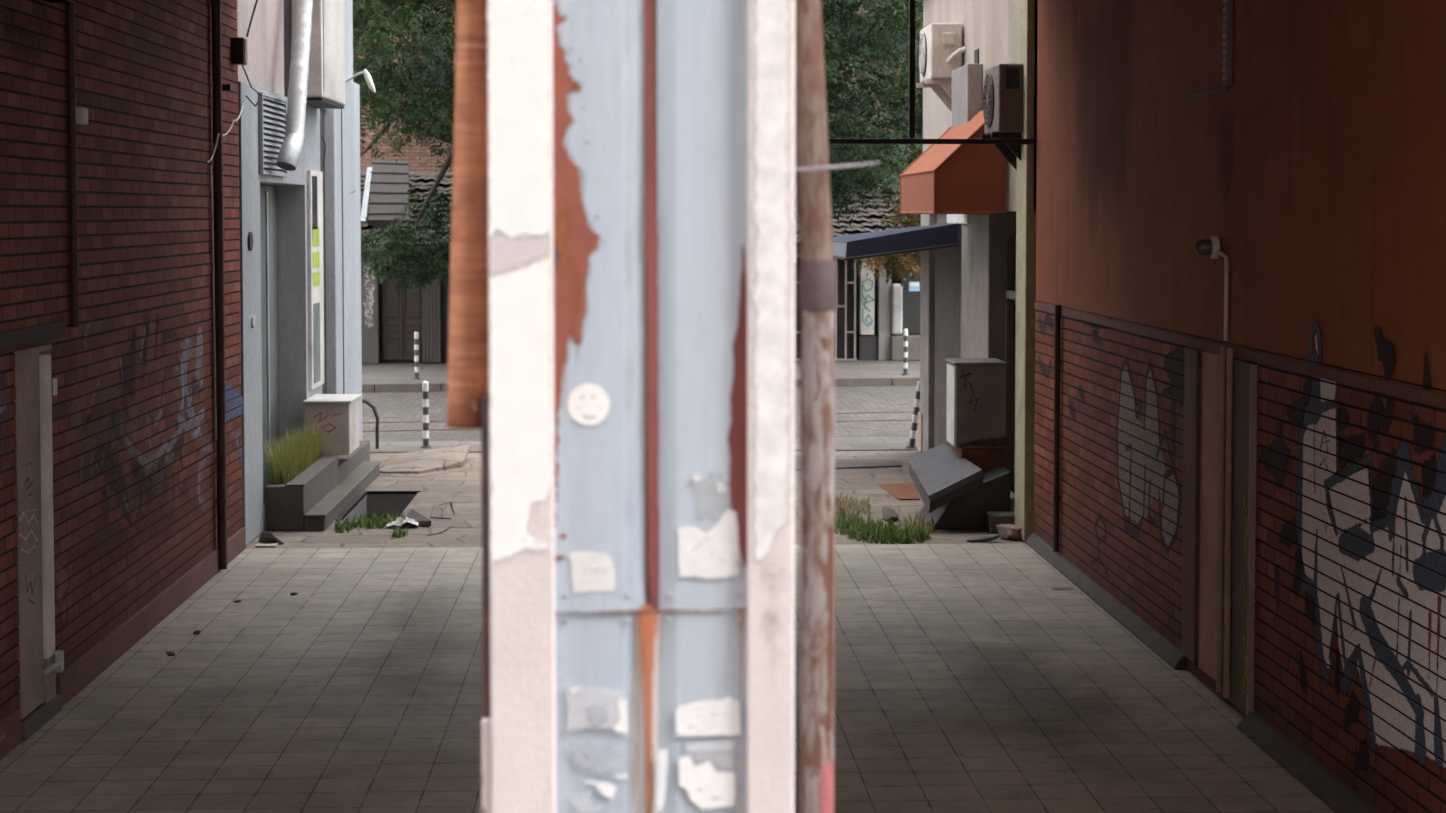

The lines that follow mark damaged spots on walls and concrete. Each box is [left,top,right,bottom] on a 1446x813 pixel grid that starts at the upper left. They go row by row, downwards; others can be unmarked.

rust [553,0,747,813]
rust [800,322,821,589]
rust [826,494,834,730]